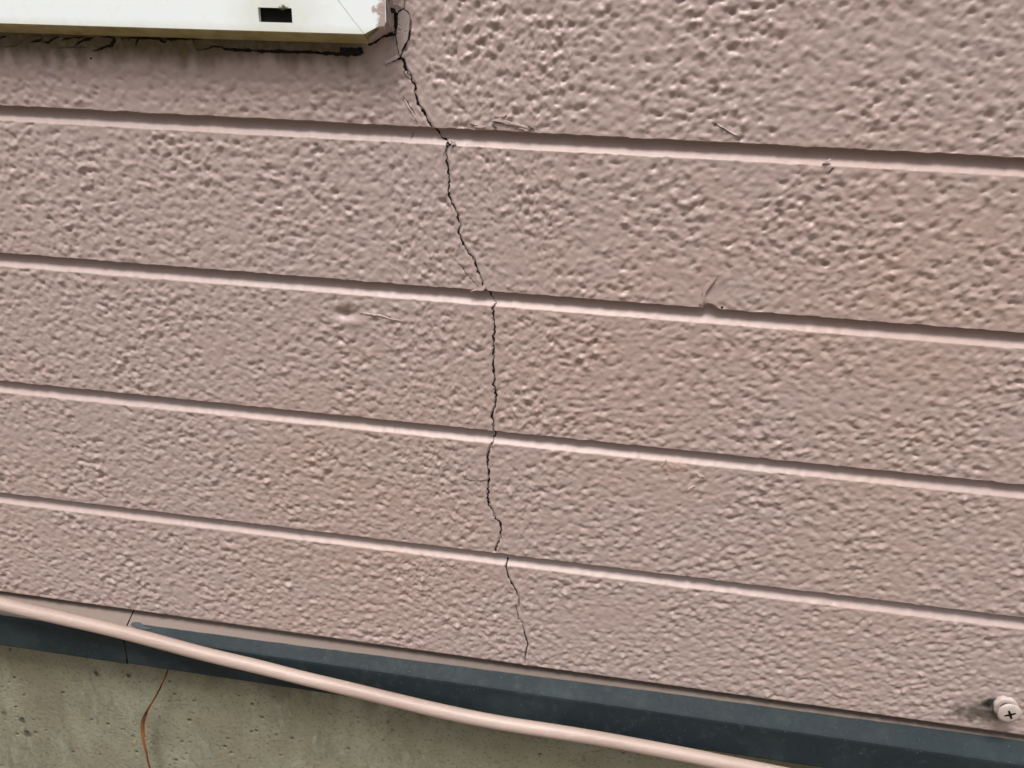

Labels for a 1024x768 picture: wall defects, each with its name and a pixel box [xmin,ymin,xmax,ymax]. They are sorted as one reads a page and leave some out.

crack [0,8,529,655]